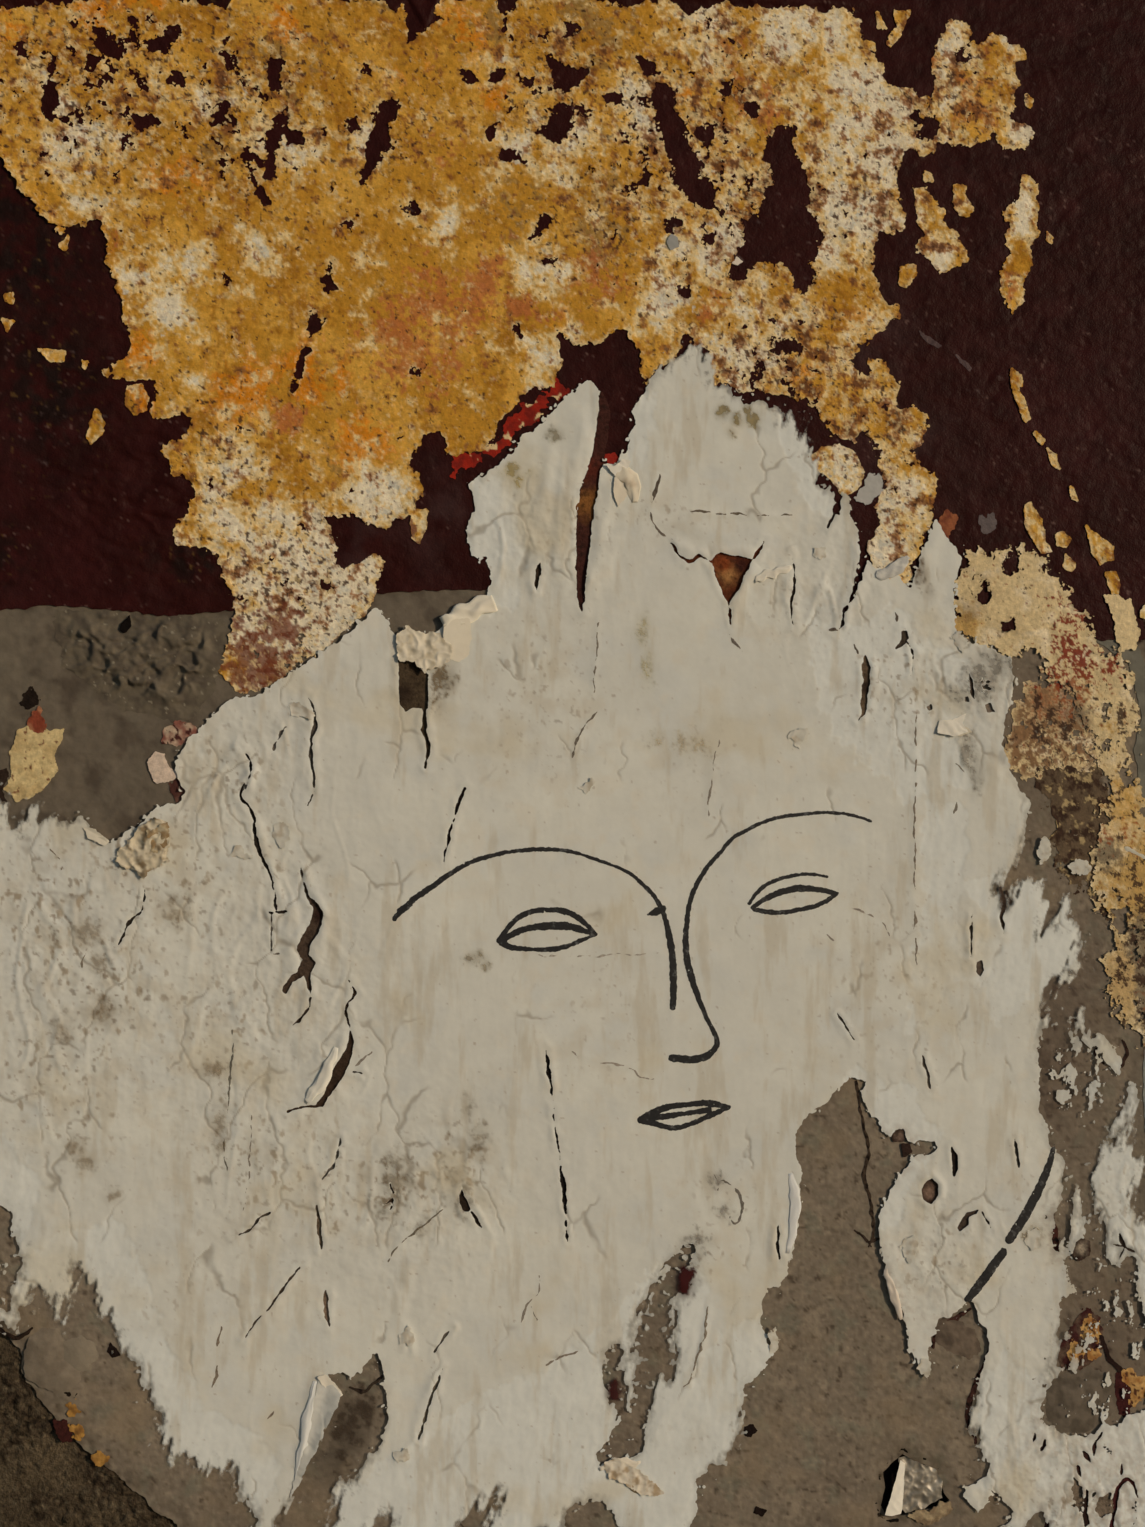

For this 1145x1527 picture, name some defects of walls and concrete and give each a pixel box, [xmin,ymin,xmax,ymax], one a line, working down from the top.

corrosion [938,509,959,539]
crack [239,698,318,955]
crack [292,980,372,1074]
crack [385,1183,482,1262]
peeling [786,1173,801,1254]
peeling [883,1269,903,1320]
crack [349,1375,383,1394]
crack [418,1331,449,1440]
peeling [916,1358,931,1378]
peeling [1057,1307,1145,1418]
spalling [744,1424,758,1437]
flaking render [875,1448,953,1525]